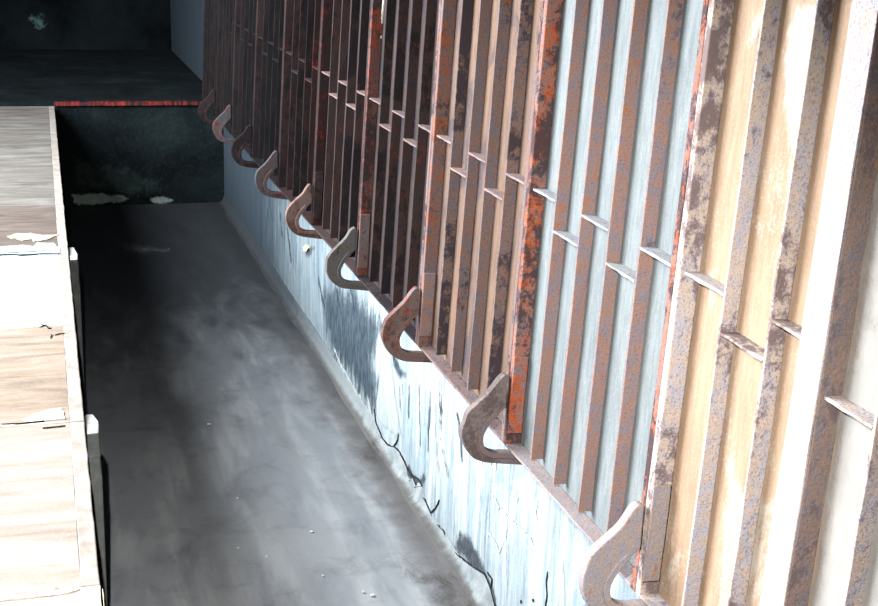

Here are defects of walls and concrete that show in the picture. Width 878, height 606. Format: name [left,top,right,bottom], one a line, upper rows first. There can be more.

crack [374,409,554,606]